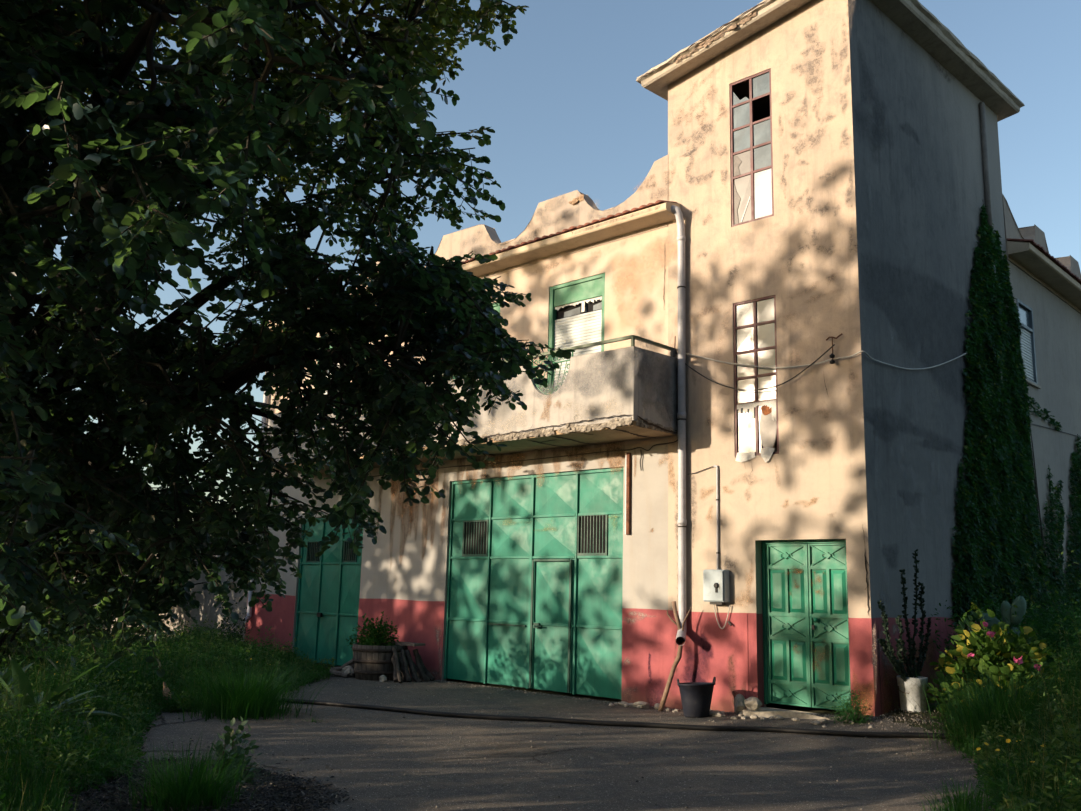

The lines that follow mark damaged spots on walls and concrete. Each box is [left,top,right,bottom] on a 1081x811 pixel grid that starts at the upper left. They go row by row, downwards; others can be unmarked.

spalling [446,417,677,446]
damp [684,635,712,682]